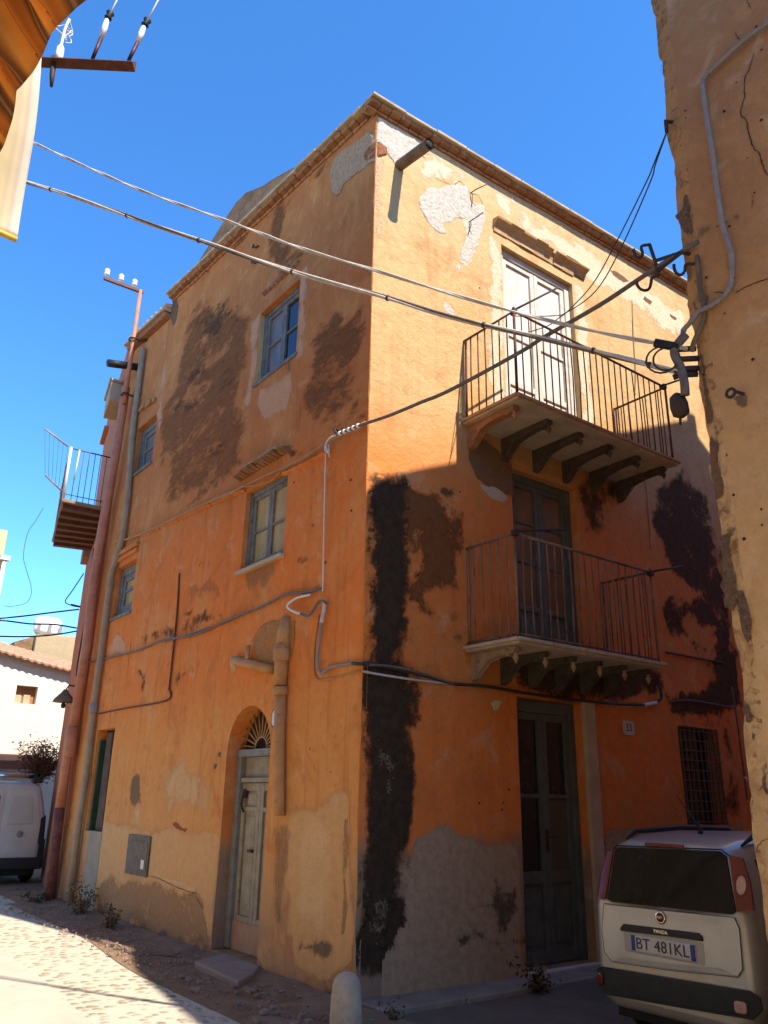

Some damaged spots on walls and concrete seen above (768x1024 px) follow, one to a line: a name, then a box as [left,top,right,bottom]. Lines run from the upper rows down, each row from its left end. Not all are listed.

crack [735,33,768,175]
water stain [161,301,249,503]
water stain [303,310,365,419]
peeling [330,118,685,423]
water stain [341,473,463,979]
water stain [517,469,742,753]